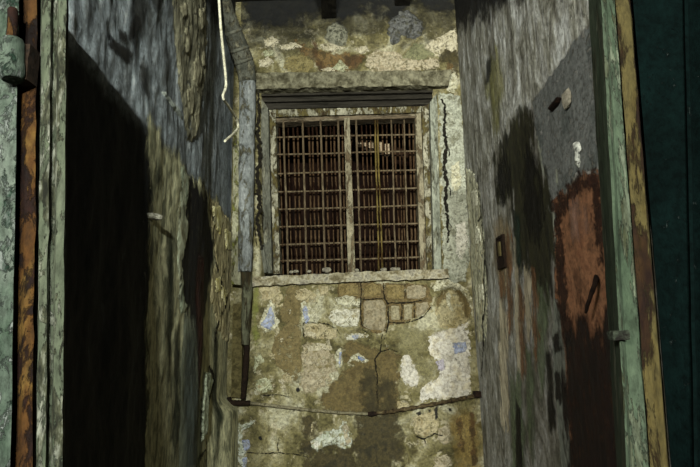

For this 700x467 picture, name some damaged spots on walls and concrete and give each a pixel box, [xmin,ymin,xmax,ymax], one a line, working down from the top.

corrosion [20,0,39,51]
peeling [259,36,302,67]
peeling [319,28,458,72]
crack [440,99,452,243]
corrosion [11,80,38,467]
peeling [254,72,488,446]
crack [343,269,431,403]
corrosion [551,167,617,467]
peeling [311,417,352,452]
peeling [433,454,453,467]